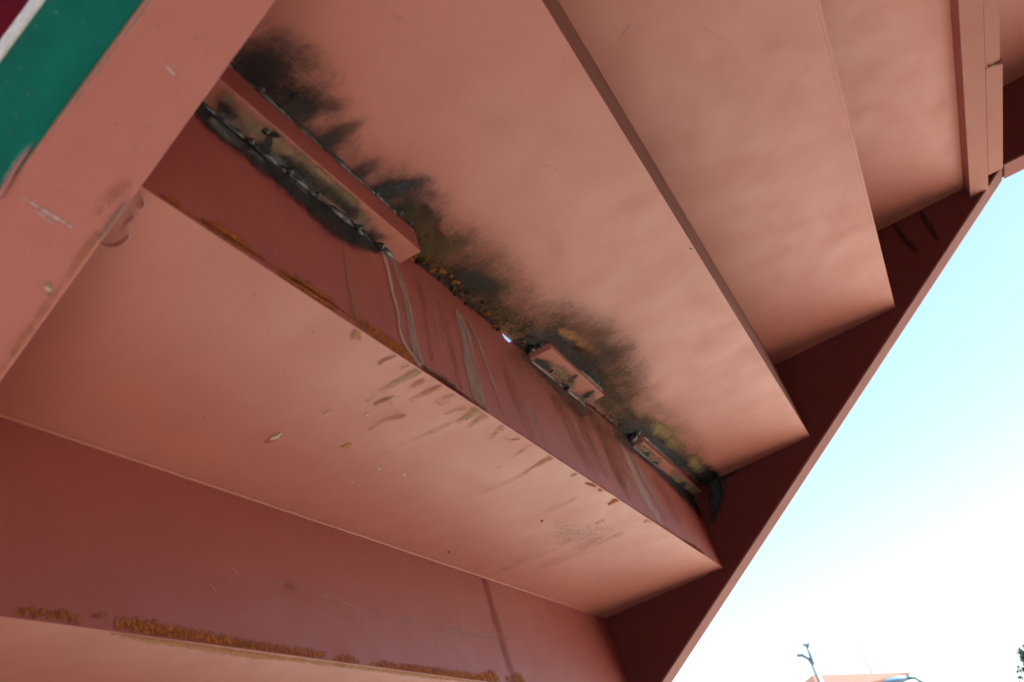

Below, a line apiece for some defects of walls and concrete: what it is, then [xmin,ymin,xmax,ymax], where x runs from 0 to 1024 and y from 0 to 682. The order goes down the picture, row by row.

water stain [217,94,424,388]
corrosion [160,194,487,423]
water stain [456,310,495,421]
water stain [535,359,594,404]
corrosion [16,606,81,625]
corrosion [93,613,525,682]